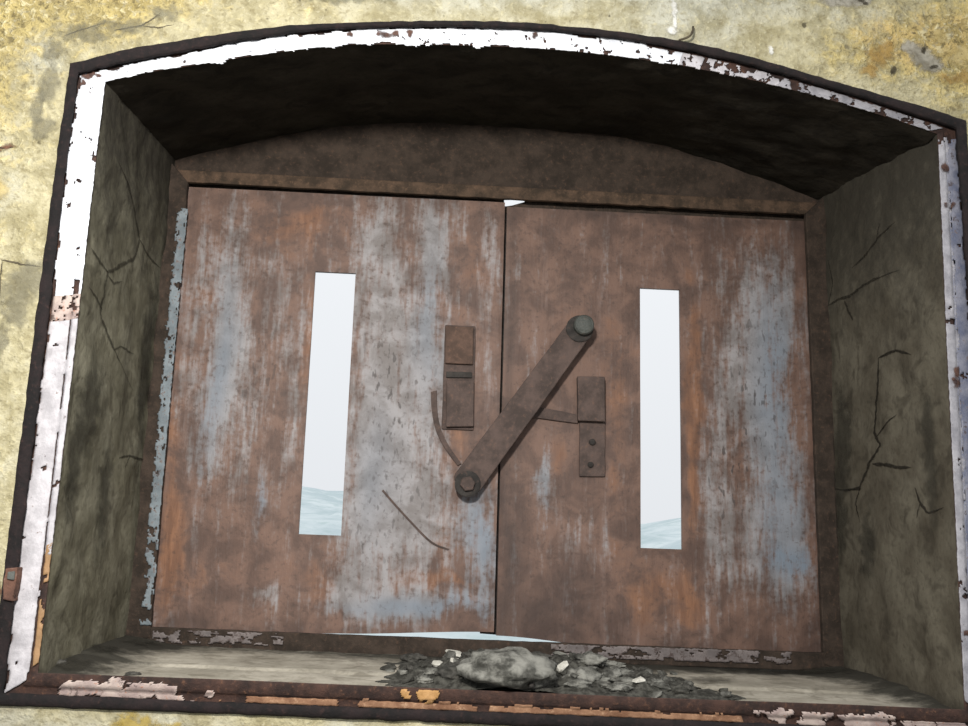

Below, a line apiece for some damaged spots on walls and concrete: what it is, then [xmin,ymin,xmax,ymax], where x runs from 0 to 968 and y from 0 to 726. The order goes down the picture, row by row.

flaking render [901,30,968,72]
peeling [798,83,942,131]
peeling [3,27,792,693]
crack [835,349,943,521]
peeling [938,137,968,703]
peeling [57,677,215,701]
peeling [753,707,967,726]